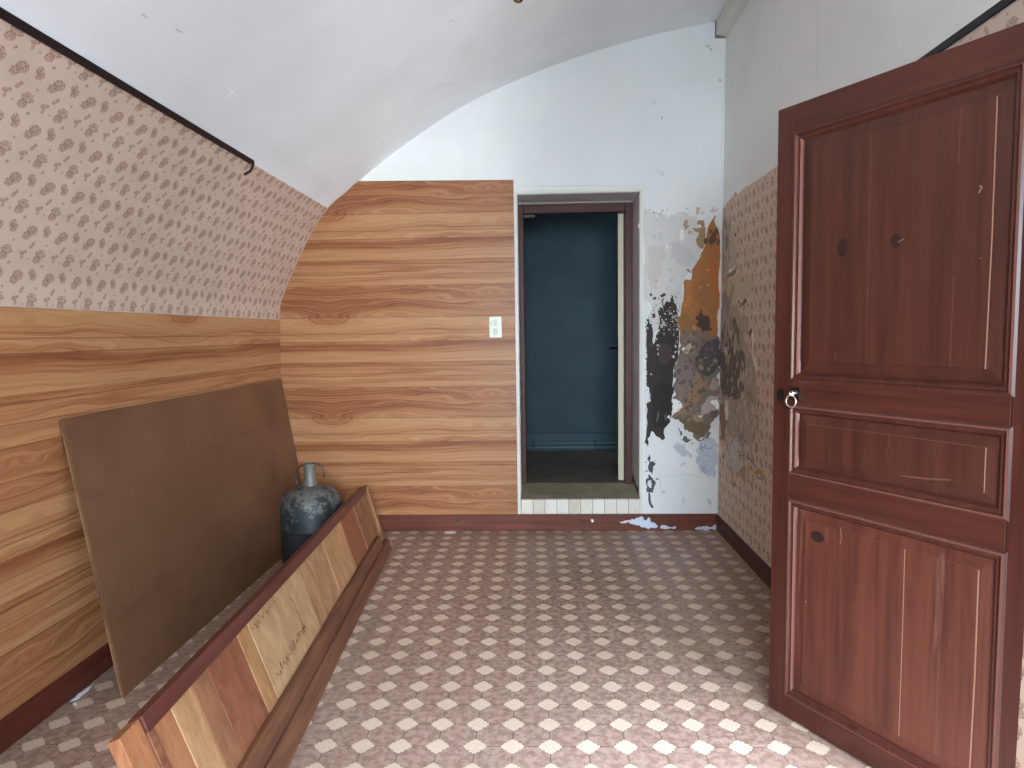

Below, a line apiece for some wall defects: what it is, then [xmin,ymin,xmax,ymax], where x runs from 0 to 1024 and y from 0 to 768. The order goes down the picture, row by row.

peeling [638,207,722,358]
peeling [656,377,719,444]
damp [645,214,765,508]
peeling [620,516,676,529]